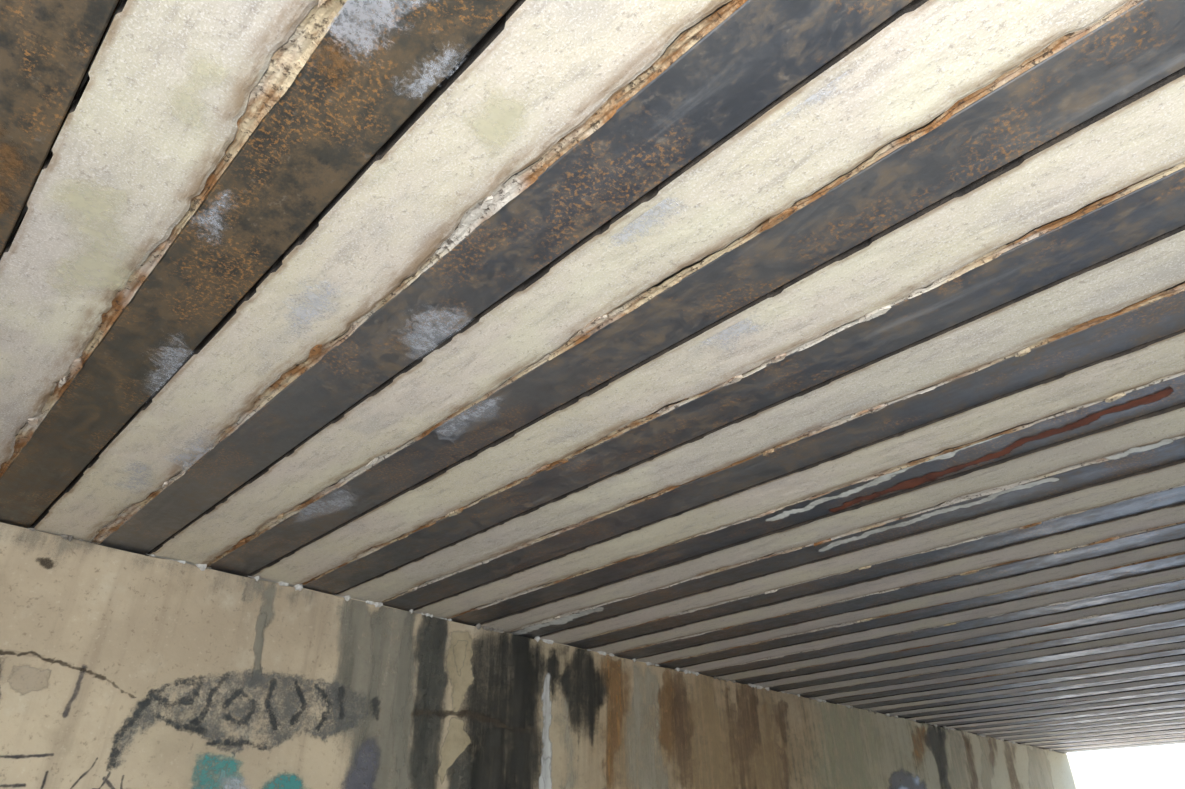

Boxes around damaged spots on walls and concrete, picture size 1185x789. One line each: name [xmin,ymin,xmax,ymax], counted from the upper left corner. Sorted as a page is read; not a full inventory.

corrosion [311,0,392,86]
spalling [0,0,349,478]
spalling [91,0,747,545]
spalling [206,0,1185,603]
corrosion [829,387,1174,512]
spalling [38,558,53,569]
crack [0,650,136,698]
damp [331,599,610,789]
corrosion [602,657,628,789]